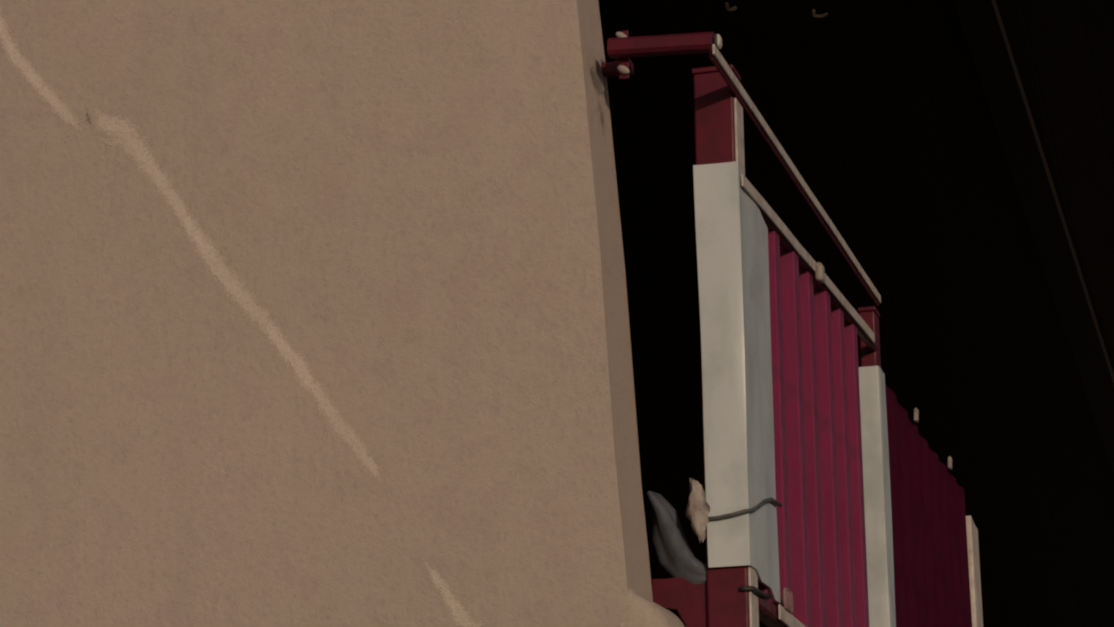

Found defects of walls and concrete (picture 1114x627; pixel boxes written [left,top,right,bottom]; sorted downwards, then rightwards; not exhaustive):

crack [0,9,381,482]
crack [423,559,487,627]